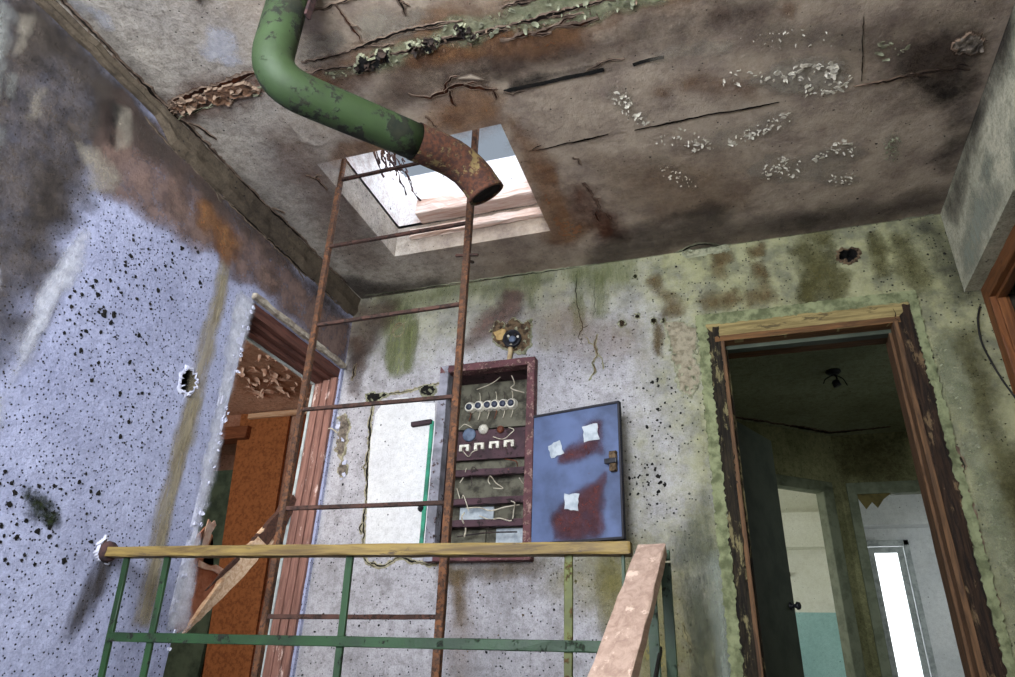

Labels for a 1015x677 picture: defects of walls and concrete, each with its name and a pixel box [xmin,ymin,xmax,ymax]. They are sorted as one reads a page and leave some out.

crack [301,0,616,75]
peeling [325,0,663,79]
crack [408,74,499,128]
crack [636,102,779,130]
crack [531,134,613,224]
leakage [0,0,362,546]
leakage [751,220,849,303]
spalling [835,246,862,265]
spalling [165,365,199,398]
spalling [185,297,312,546]
leakage [70,561,106,632]
leakage [168,558,195,631]